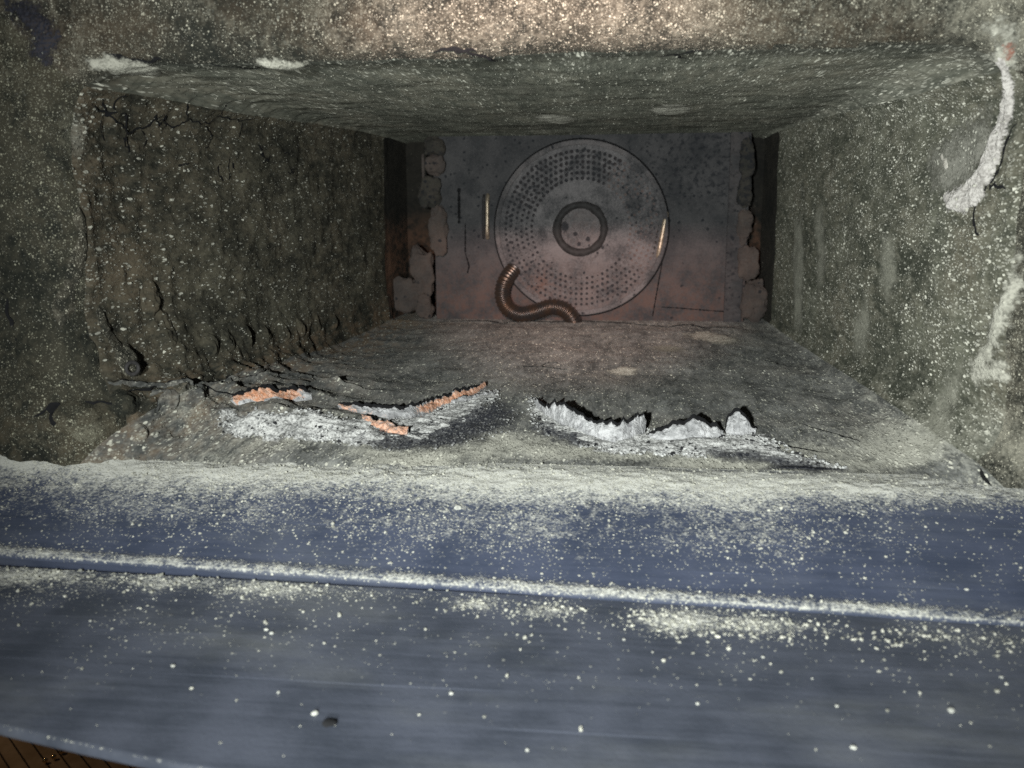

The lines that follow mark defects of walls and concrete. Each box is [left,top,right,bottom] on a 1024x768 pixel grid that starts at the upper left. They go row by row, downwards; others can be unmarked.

crack [92,95,298,181]
peeling [218,381,511,450]
peeling [526,397,847,473]